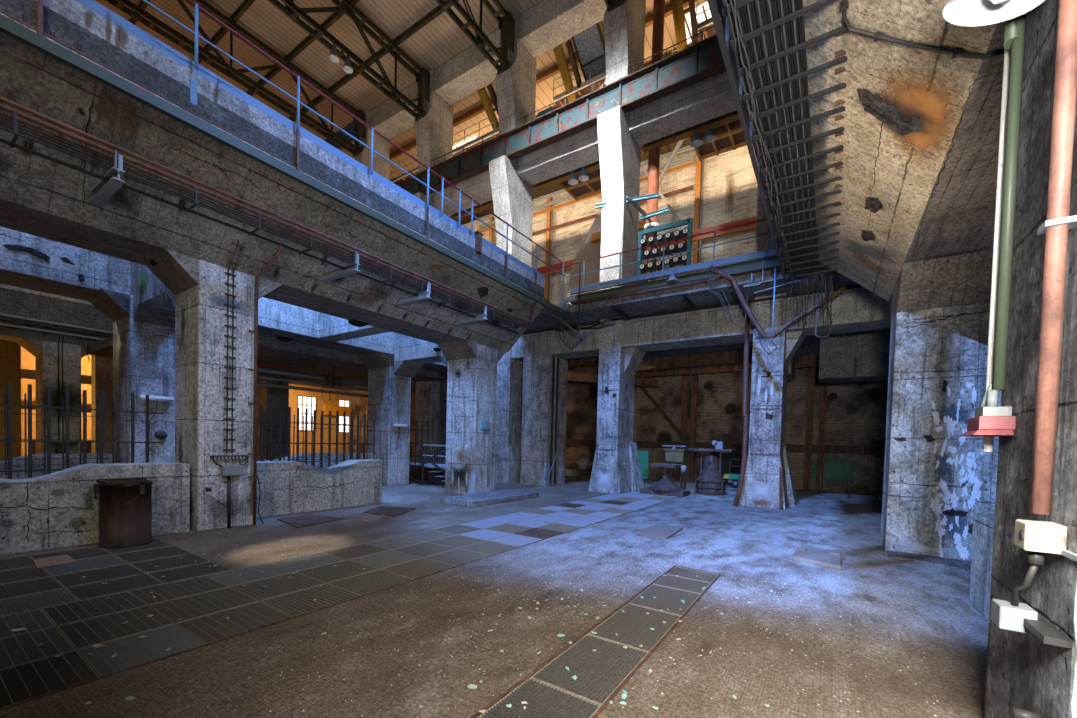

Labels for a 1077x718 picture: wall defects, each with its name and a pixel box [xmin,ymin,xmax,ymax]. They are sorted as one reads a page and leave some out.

spalling [857,88,925,135]
corrosion [888,79,951,154]
spalling [3,244,85,281]
peeling [923,380,985,560]